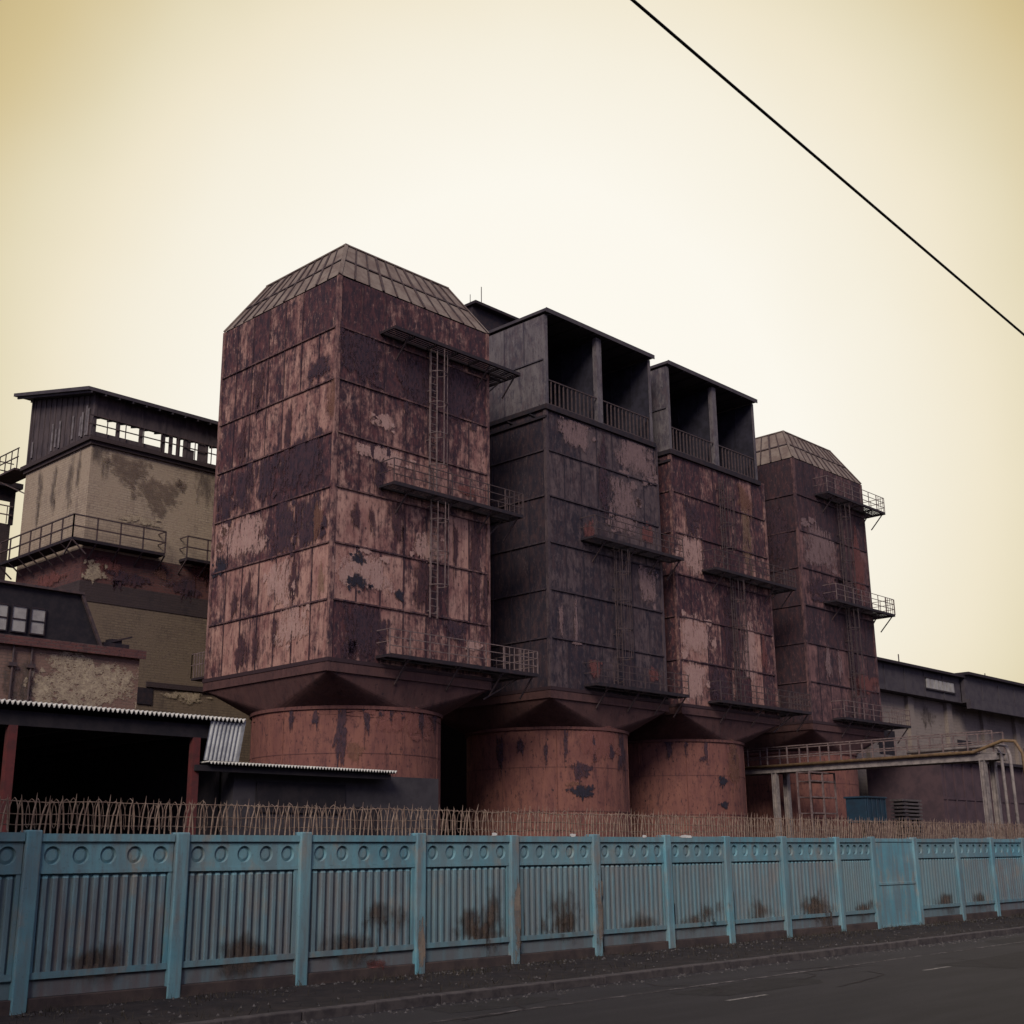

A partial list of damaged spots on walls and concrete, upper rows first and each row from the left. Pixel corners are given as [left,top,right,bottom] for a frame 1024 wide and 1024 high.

corrosion [308,355,335,417]
corrosion [284,404,292,486]
corrosion [350,502,375,535]
corrosion [388,499,405,552]
corrosion [684,498,699,547]
corrosion [231,570,258,672]
corrosion [288,560,298,606]
corrosion [414,561,435,623]
corrosion [443,492,480,647]
spalling [23,651,139,710]
corrosion [332,706,440,768]